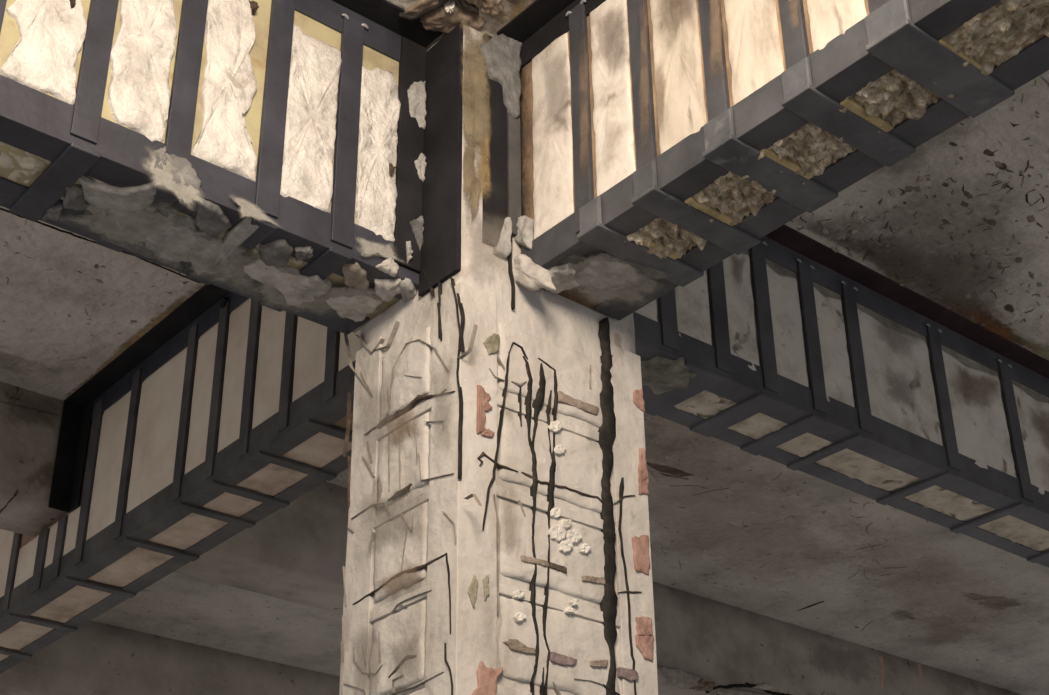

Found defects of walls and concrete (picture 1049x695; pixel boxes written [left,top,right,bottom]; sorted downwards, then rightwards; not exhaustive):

spalling [399,0,521,34]
peeling [480,34,522,119]
peeling [41,176,156,230]
peeling [146,146,424,322]
crack [507,234,515,310]
peeling [493,215,650,294]
crack [341,293,642,695]